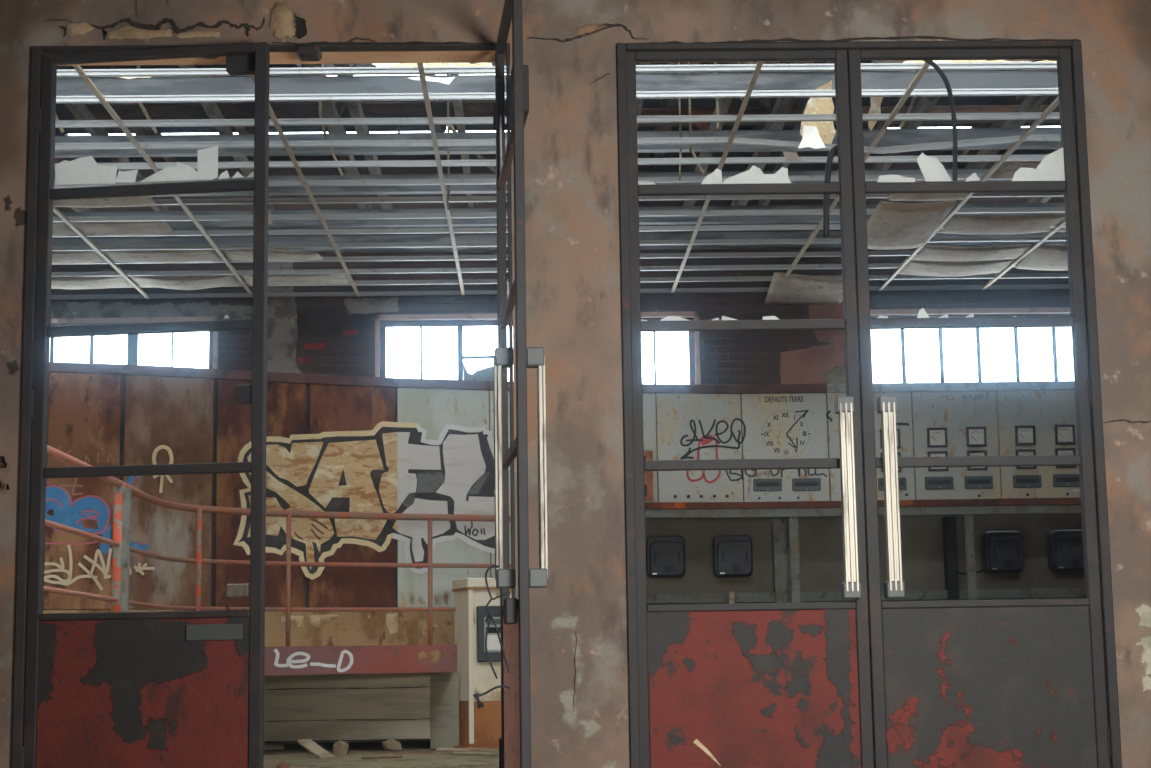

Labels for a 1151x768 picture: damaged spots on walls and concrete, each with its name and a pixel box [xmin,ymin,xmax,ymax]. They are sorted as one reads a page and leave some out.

crack [48,0,467,44]
crack [527,23,1078,43]